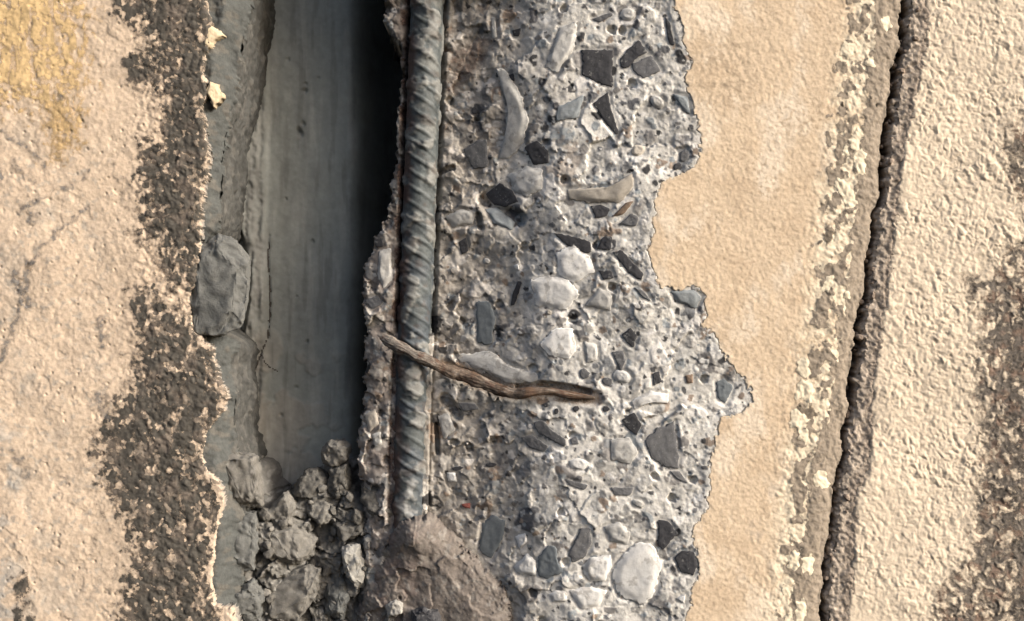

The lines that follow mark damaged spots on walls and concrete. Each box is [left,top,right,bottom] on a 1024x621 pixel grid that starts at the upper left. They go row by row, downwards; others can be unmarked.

spalling [205,0,753,621]
crack [818,0,930,621]